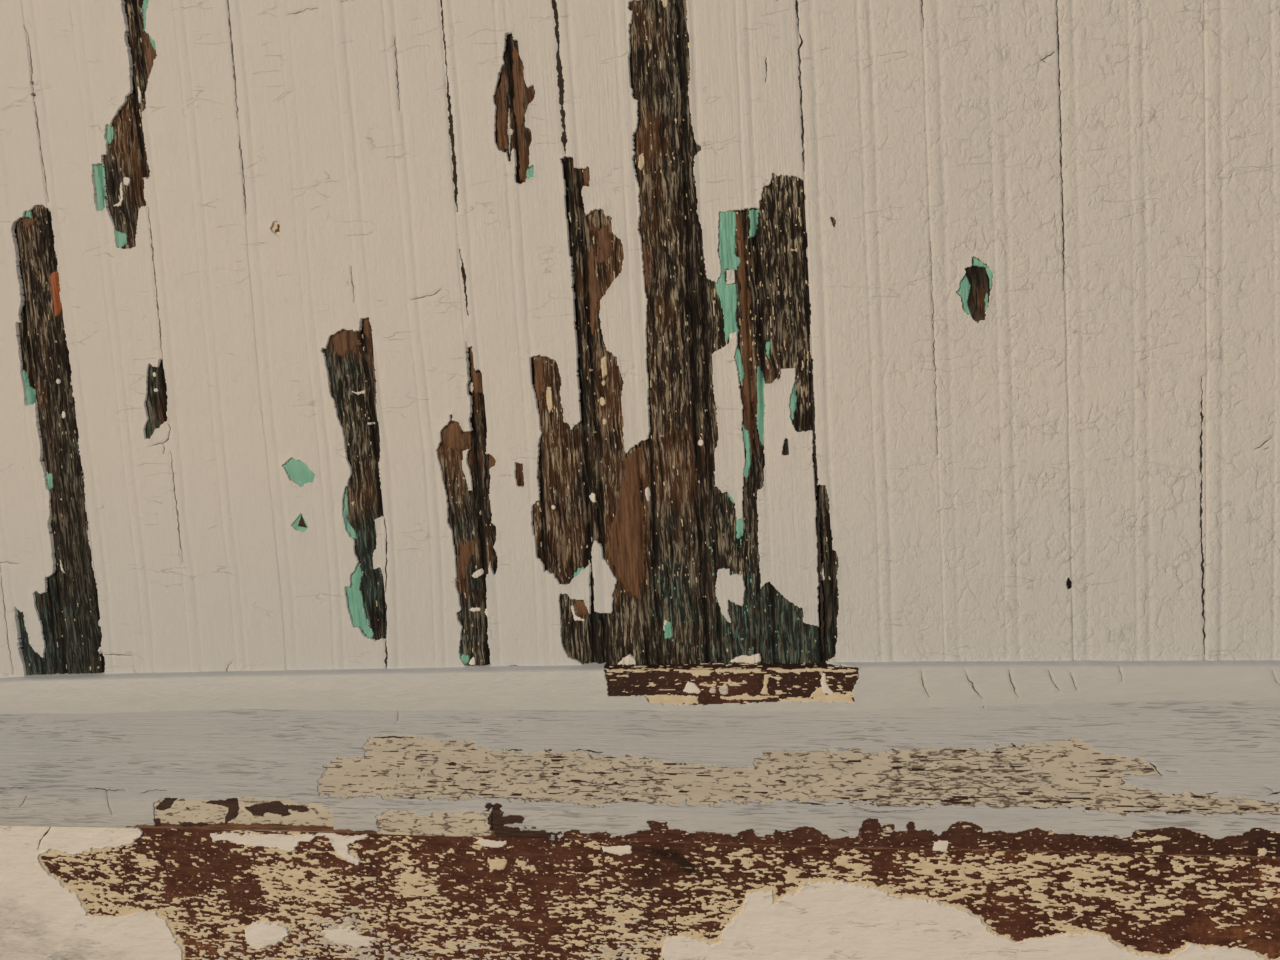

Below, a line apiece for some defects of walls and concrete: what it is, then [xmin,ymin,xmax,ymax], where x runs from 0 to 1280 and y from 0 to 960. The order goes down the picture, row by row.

peeling [94,0,157,249]
peeling [494,33,535,184]
peeling [14,205,105,675]
peeling [145,360,168,439]
peeling [283,457,315,487]
peeling [291,514,308,532]
peeling [322,317,387,640]
peeling [437,346,498,666]
peeling [515,0,859,706]
peeling [956,257,993,323]
peeling [38,734,1280,960]